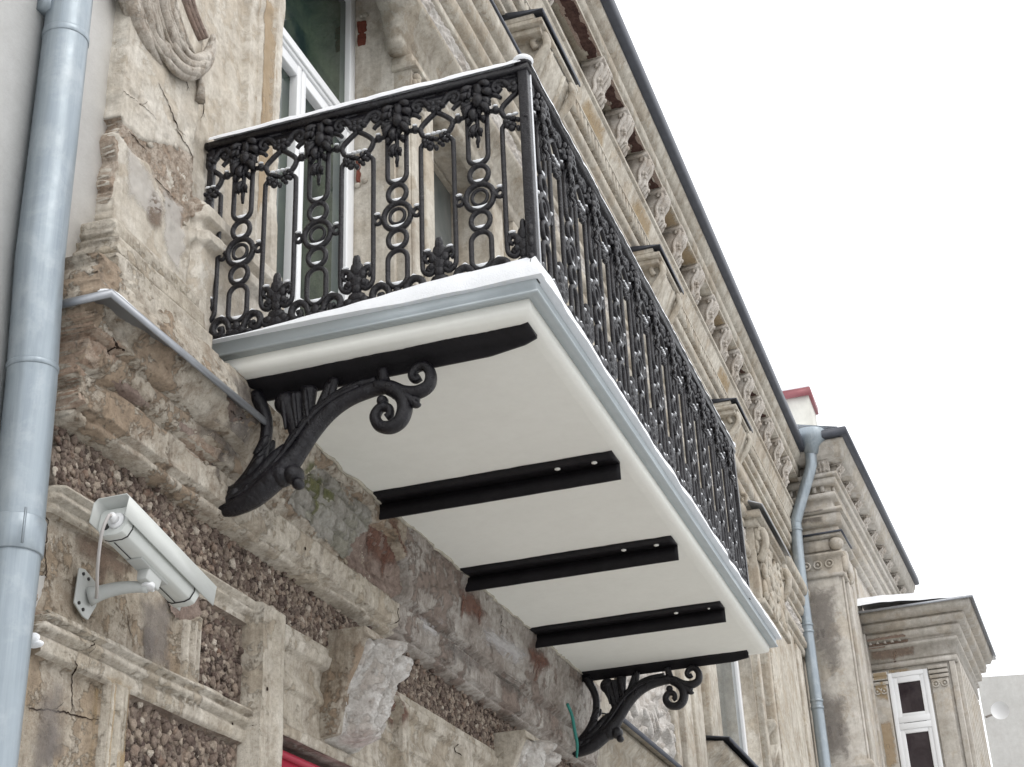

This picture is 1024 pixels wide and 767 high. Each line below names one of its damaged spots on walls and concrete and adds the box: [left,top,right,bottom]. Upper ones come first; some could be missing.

crack [124,63,205,157]
flaking render [96,116,205,265]
crack [29,640,99,720]